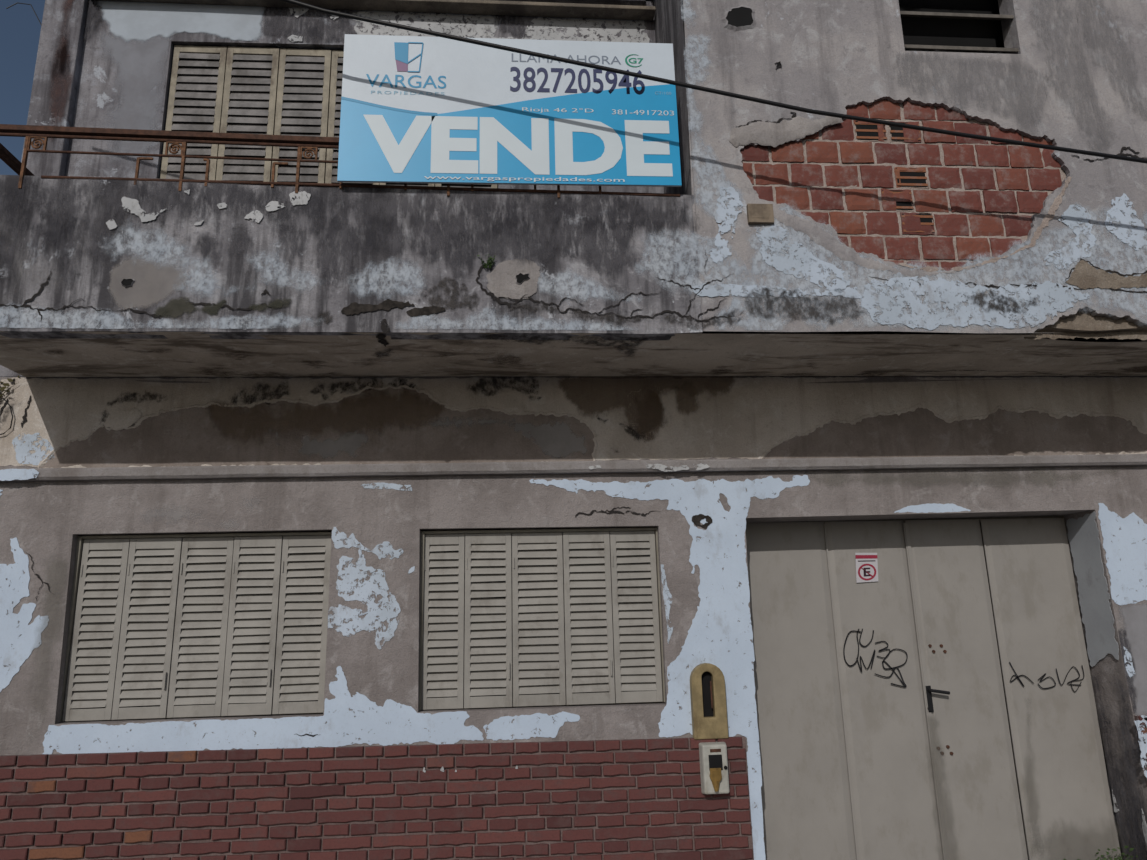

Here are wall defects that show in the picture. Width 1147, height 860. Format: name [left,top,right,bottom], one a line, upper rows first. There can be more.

peeling [330,11,649,43]
peeling [97,1,266,158]
peeling [636,35,1147,340]
damp [196,234,218,265]
crack [0,271,162,320]
crack [190,289,287,311]
crack [476,250,744,322]
crack [0,395,31,427]
damp [209,357,587,458]
damp [560,369,733,440]
flaking render [757,403,1147,459]
flaking render [0,385,810,860]